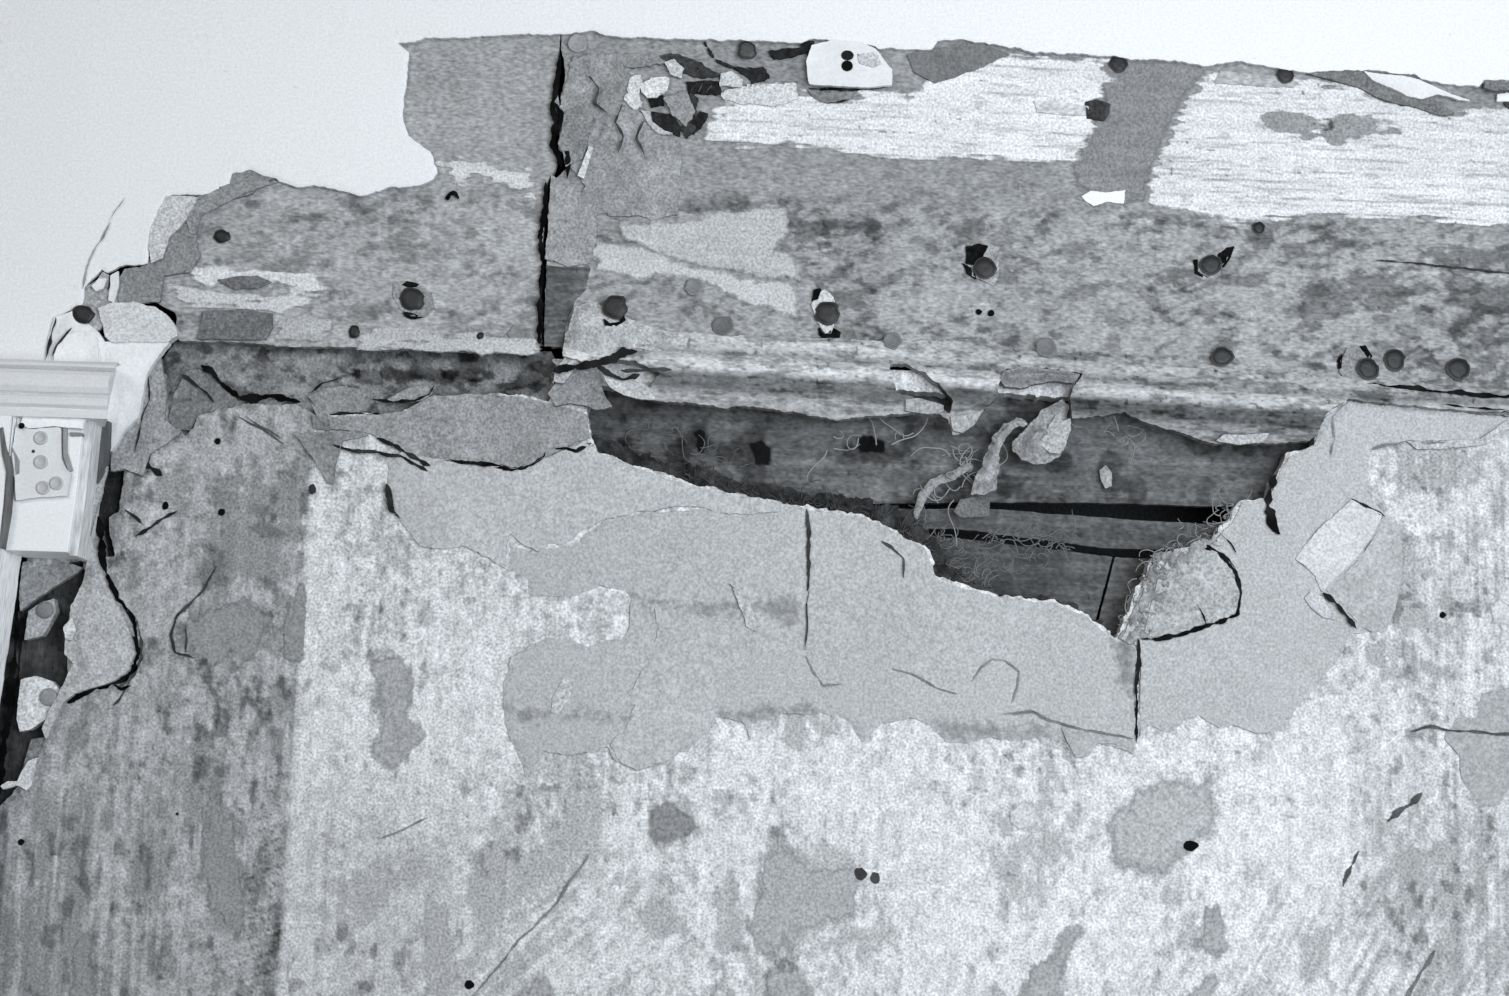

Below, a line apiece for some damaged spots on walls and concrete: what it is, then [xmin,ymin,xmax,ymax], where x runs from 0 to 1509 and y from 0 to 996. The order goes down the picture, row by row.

crack [536,55,672,381]
peeling [619,41,1509,226]
crack [134,377,162,476]
peeling [46,106,1509,778]
crack [67,510,217,706]
crack [805,509,839,686]